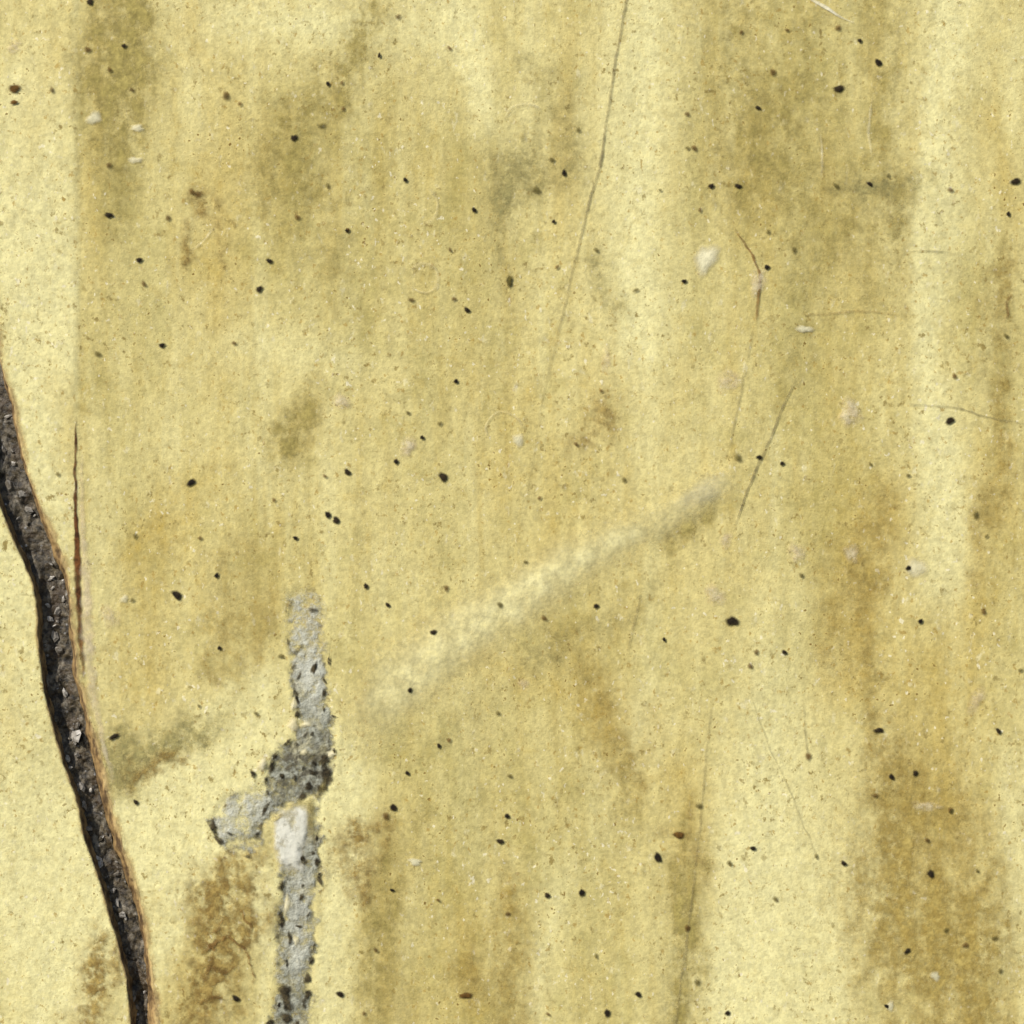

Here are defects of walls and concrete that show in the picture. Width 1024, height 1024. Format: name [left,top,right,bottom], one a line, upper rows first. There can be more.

leakage [81,0,154,194]
leakage [261,102,324,199]
leakage [336,22,367,117]
leakage [733,91,805,208]
leakage [273,399,315,457]
crack [0,340,160,1024]
peeling [206,594,336,1024]
leakage [869,754,1011,1024]